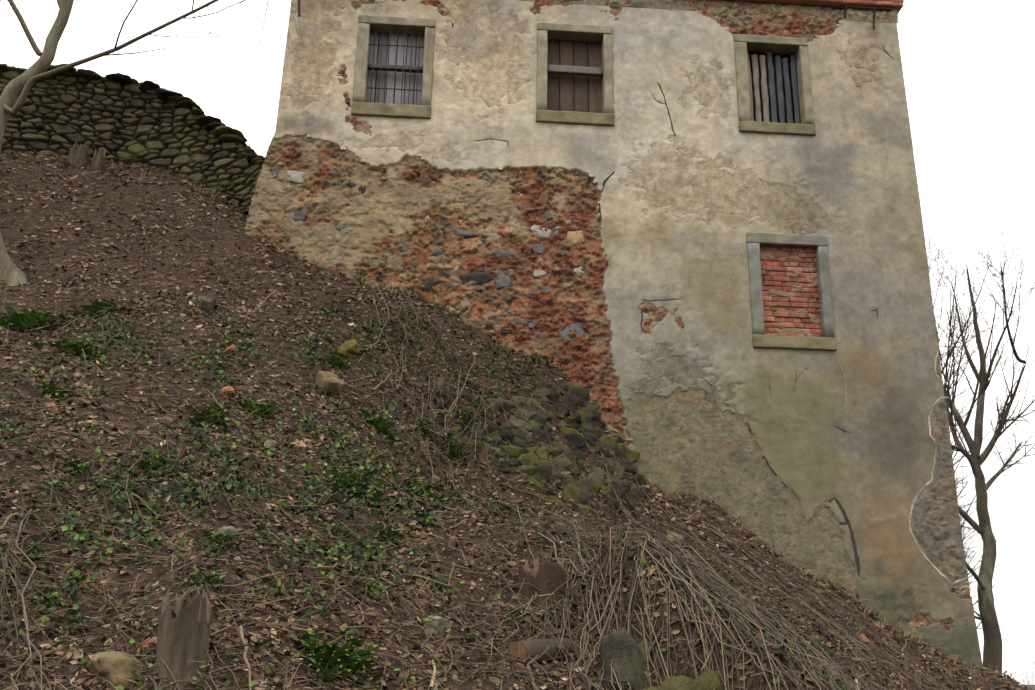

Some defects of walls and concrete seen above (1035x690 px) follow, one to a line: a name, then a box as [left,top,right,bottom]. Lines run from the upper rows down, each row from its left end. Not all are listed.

crack [653,82,679,151]
spalling [245,0,885,602]
crack [763,456,787,487]
flaking render [912,399,972,601]